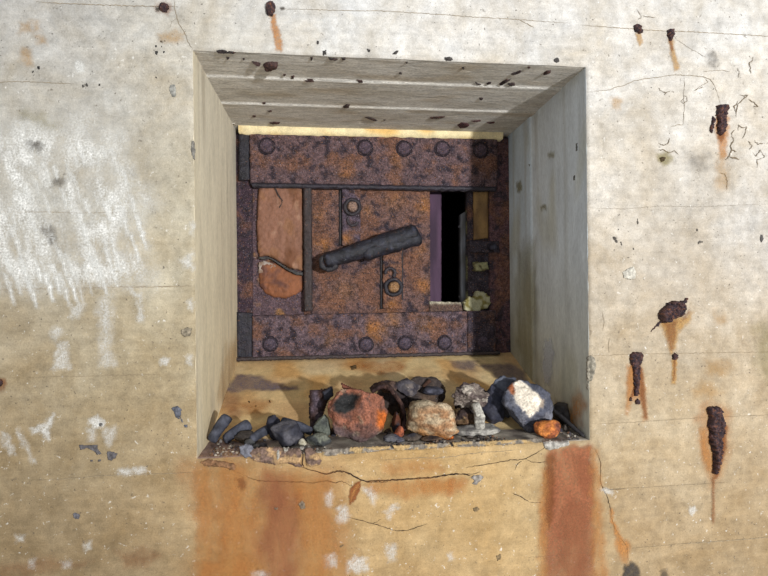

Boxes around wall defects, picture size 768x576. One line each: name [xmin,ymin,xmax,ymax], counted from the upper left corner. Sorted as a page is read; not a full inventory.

rust [266,1,284,50]
rust [667,28,679,69]
crack [587,26,762,126]
rust [709,104,730,155]
rust [259,262,303,299]
rust [651,298,690,384]
rust [629,352,646,418]
crack [41,450,541,485]
rust [349,481,361,504]
rust [541,446,599,576]
crack [594,448,724,553]
rust [702,406,728,520]